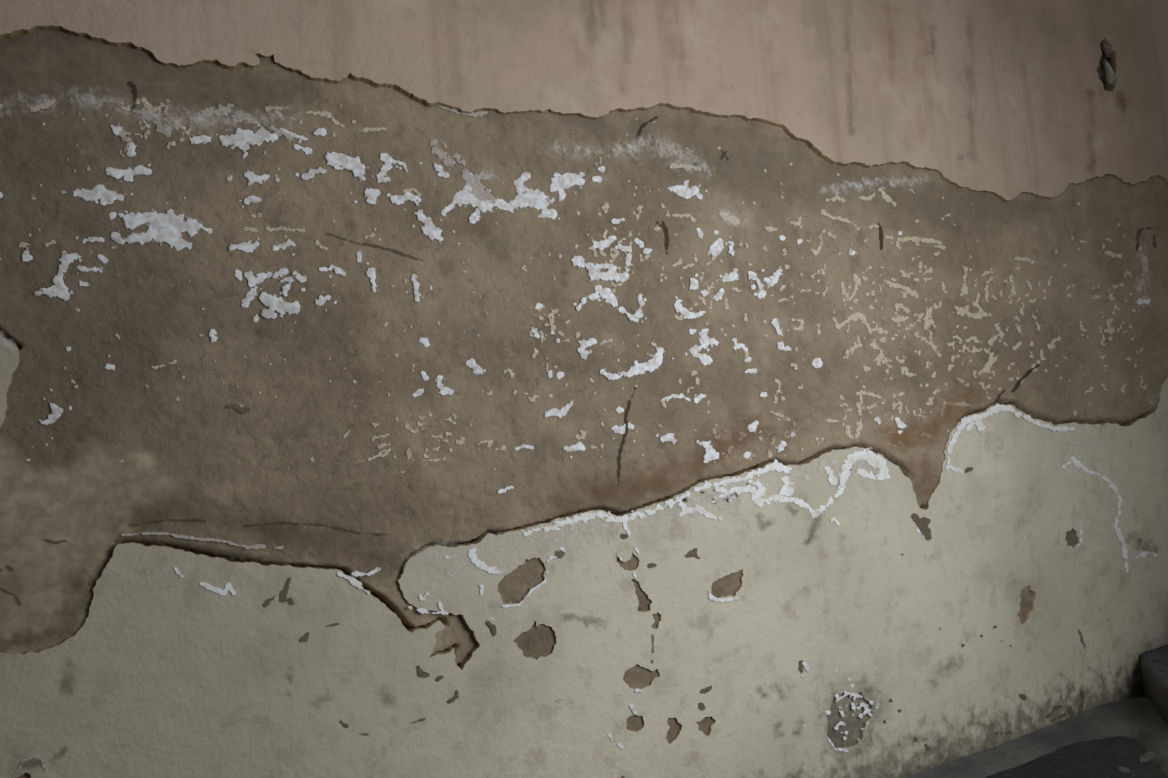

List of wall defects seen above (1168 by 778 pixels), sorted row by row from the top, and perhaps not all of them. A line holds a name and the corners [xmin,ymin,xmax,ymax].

crack [618,387,637,486]
damp [945,403,1083,470]
damp [520,447,891,542]
spalling [911,513,932,540]
damp [337,567,381,594]
damp [408,581,449,615]
damp [425,548,505,595]
spalling [497,547,566,608]
spalling [616,533,661,629]
spalling [708,570,743,602]
spalling [514,621,557,660]
spalling [825,669,887,752]